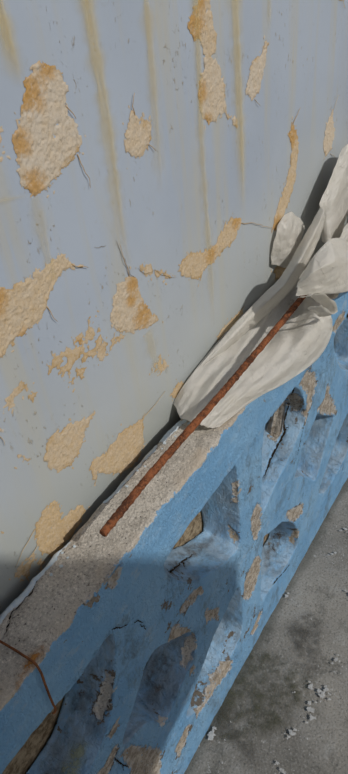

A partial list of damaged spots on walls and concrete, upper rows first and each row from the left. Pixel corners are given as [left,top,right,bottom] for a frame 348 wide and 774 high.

peeling [187,0,238,129]
peeling [0,60,91,198]
peeling [122,93,156,159]
peeling [47,109,300,393]
peeling [0,253,89,358]
peeling [3,381,38,414]
peeling [44,410,96,473]
spalling [89,295,307,540]
crack [264,388,305,476]
crack [6,581,37,632]
spalling [97,717,162,774]